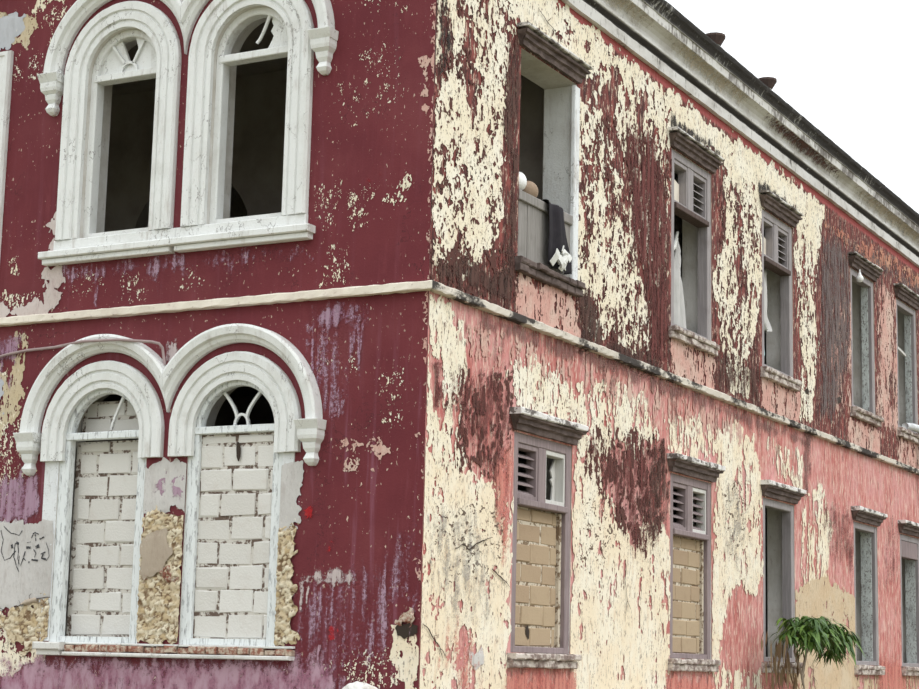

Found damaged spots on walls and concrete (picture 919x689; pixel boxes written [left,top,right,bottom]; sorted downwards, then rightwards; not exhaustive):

peeling [11,0,67,83]
peeling [340,43,404,127]
flaking render [46,211,57,251]
flaking render [0,265,104,318]
peeling [319,243,349,288]
peeling [314,172,412,231]
peeling [418,0,919,425]
peeling [0,331,37,507]
peeling [324,283,919,689]
spalling [136,457,187,647]
flaking render [0,519,54,677]